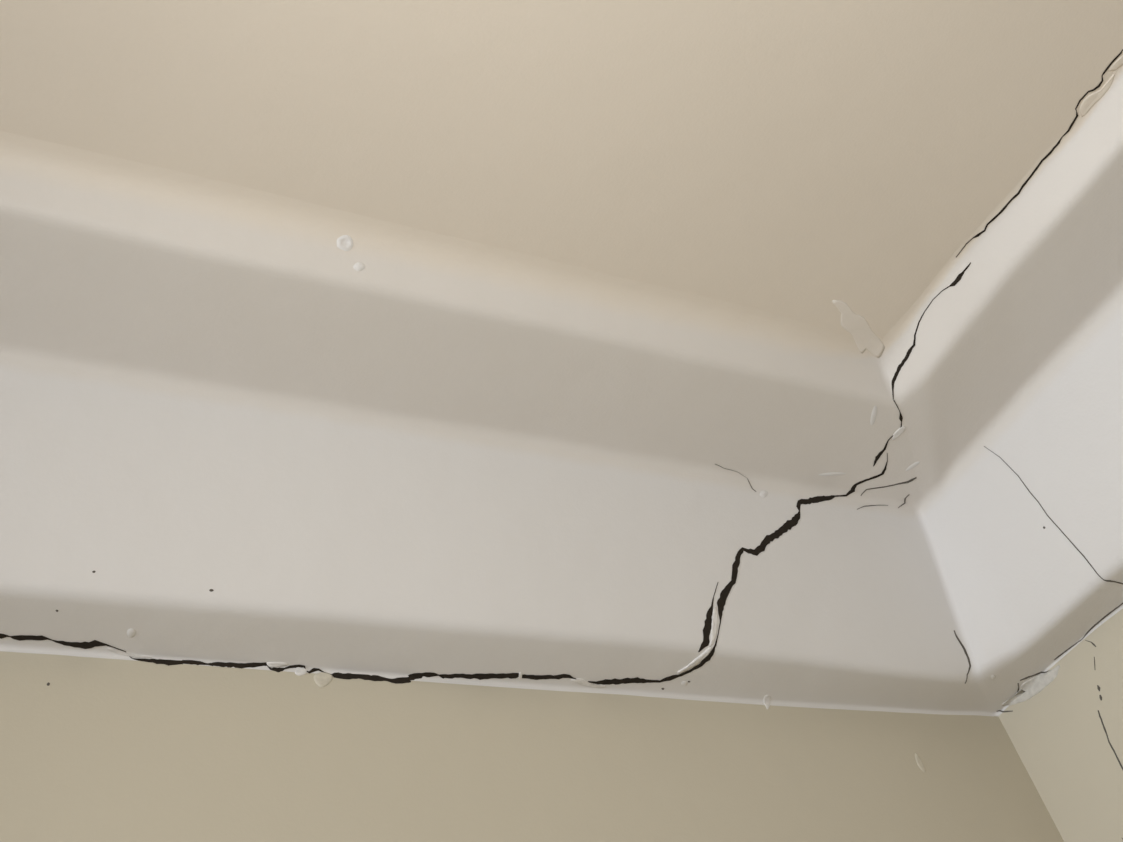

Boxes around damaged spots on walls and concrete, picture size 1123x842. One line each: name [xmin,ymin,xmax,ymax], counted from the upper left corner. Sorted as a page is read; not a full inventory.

crack [0,50,1123,688]
crack [984,446,1123,770]